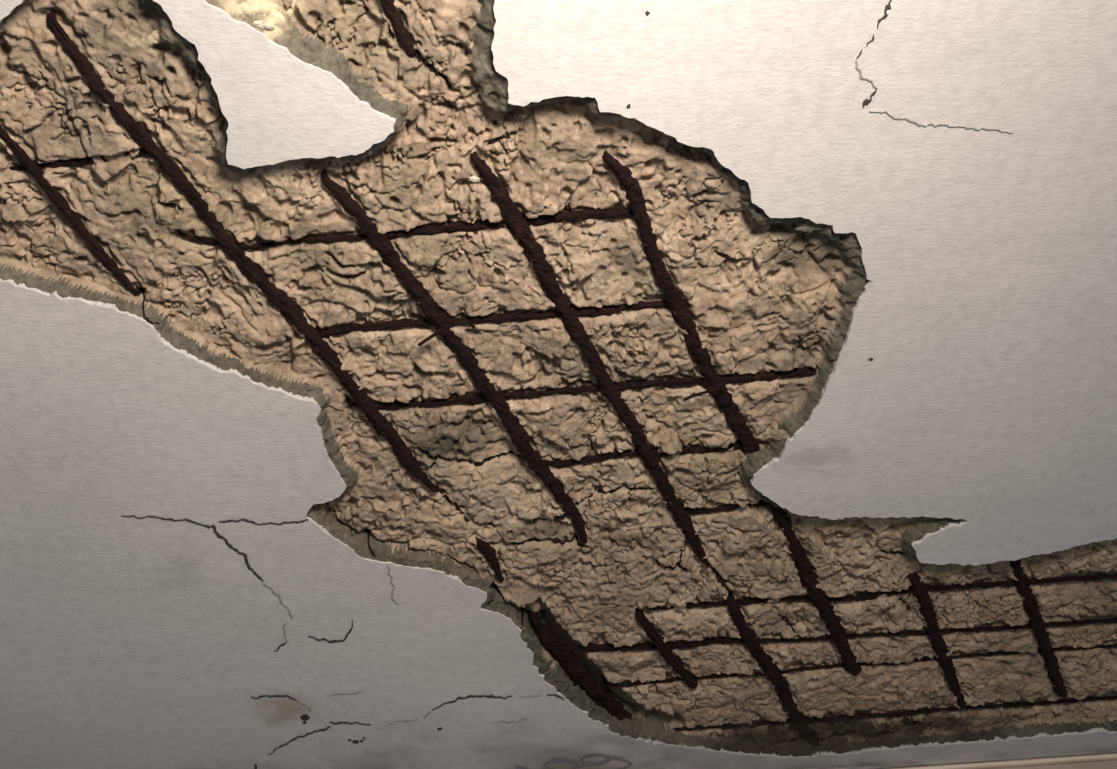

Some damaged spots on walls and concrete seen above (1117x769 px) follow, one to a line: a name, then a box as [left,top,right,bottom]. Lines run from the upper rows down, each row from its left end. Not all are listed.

crack [856,0,1013,133]
spalling [0,0,869,751]
crack [121,515,353,651]
spalling [760,503,1117,746]
crack [251,690,564,755]
spalling [843,733,894,752]